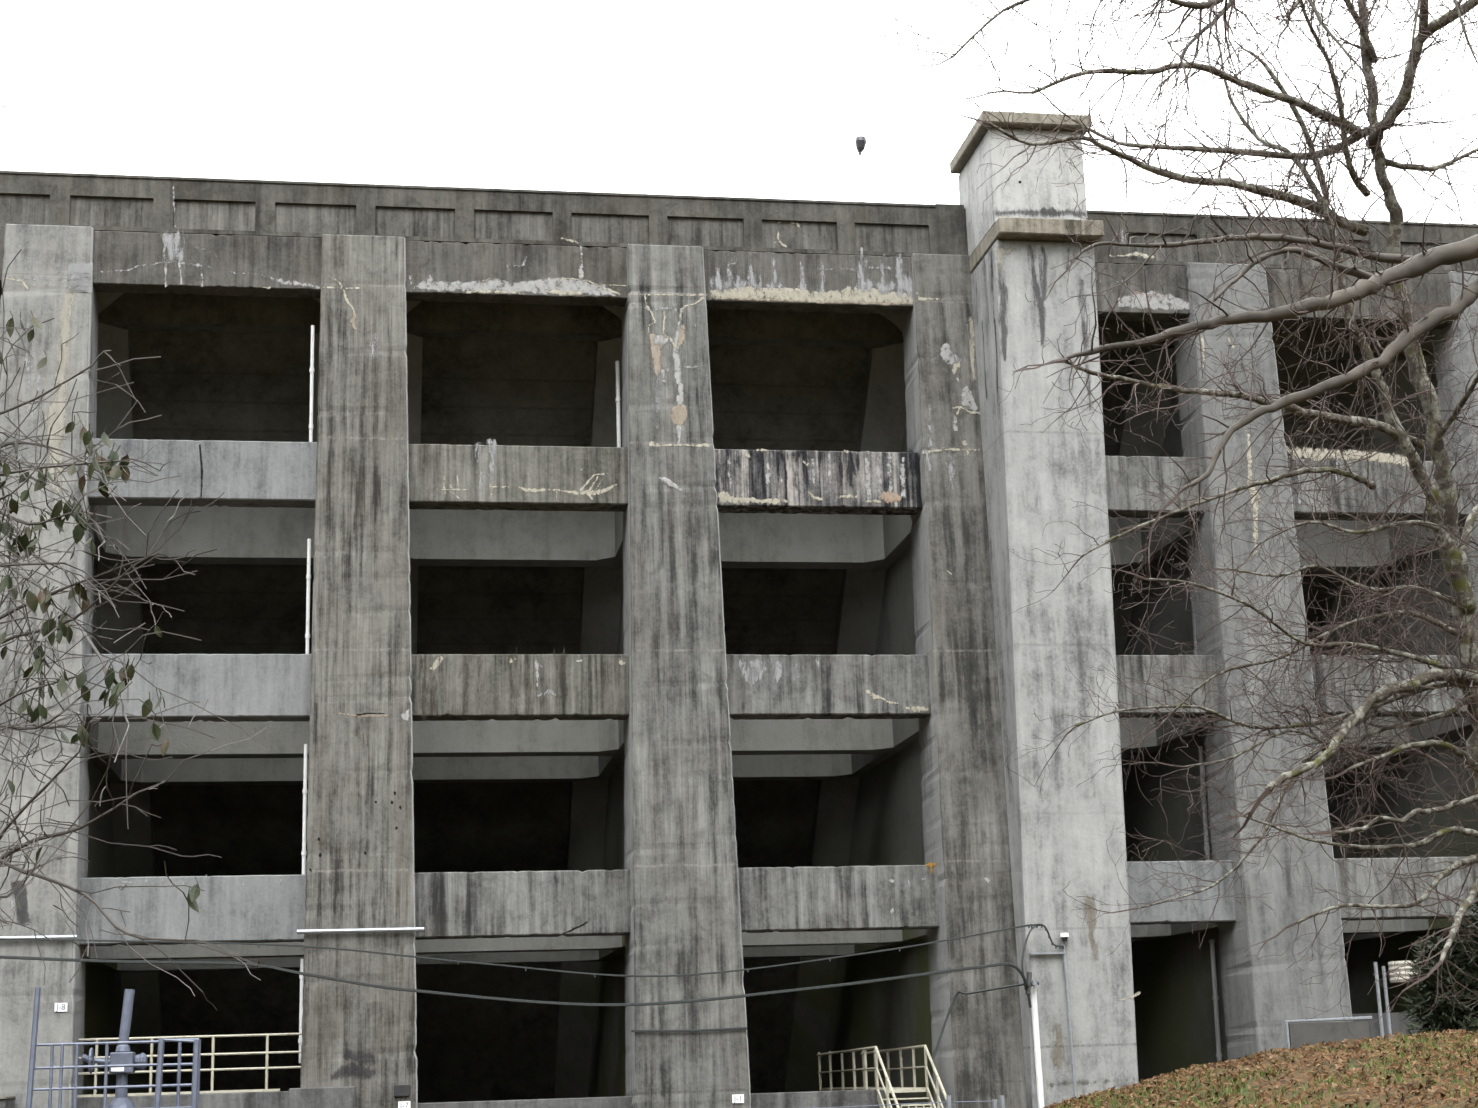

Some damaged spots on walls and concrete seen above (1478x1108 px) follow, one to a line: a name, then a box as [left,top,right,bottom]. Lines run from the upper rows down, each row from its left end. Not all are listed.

efflorescence [710,221,913,298]
spalling [710,286,914,306]
leakage [967,245,1048,402]
leakage [1066,249,1091,407]
spalling [940,343,980,415]
leakage [719,407,932,500]